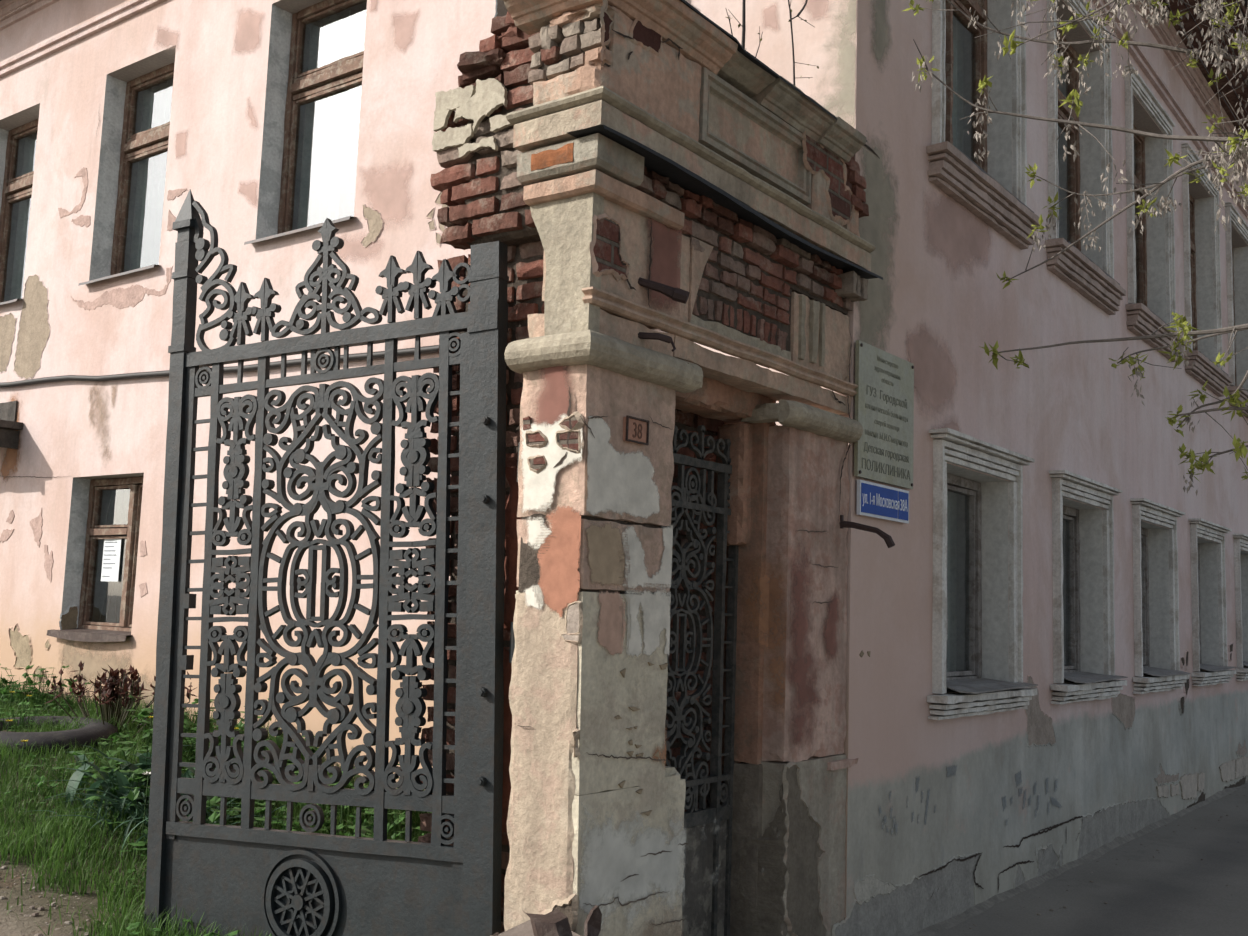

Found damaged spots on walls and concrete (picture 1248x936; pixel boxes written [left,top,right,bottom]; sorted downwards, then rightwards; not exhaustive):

peeling [432,78,512,159]
peeling [58,167,90,227]
flaking render [589,213,629,281]
peeling [0,274,51,380]
peeling [71,266,173,310]
peeling [521,411,673,678]
peeling [9,623,51,682]
peeling [59,605,79,630]
leakage [742,556,819,745]
leakage [824,596,839,658]
spalling [738,762,828,936]
crack [920,809,1102,897]